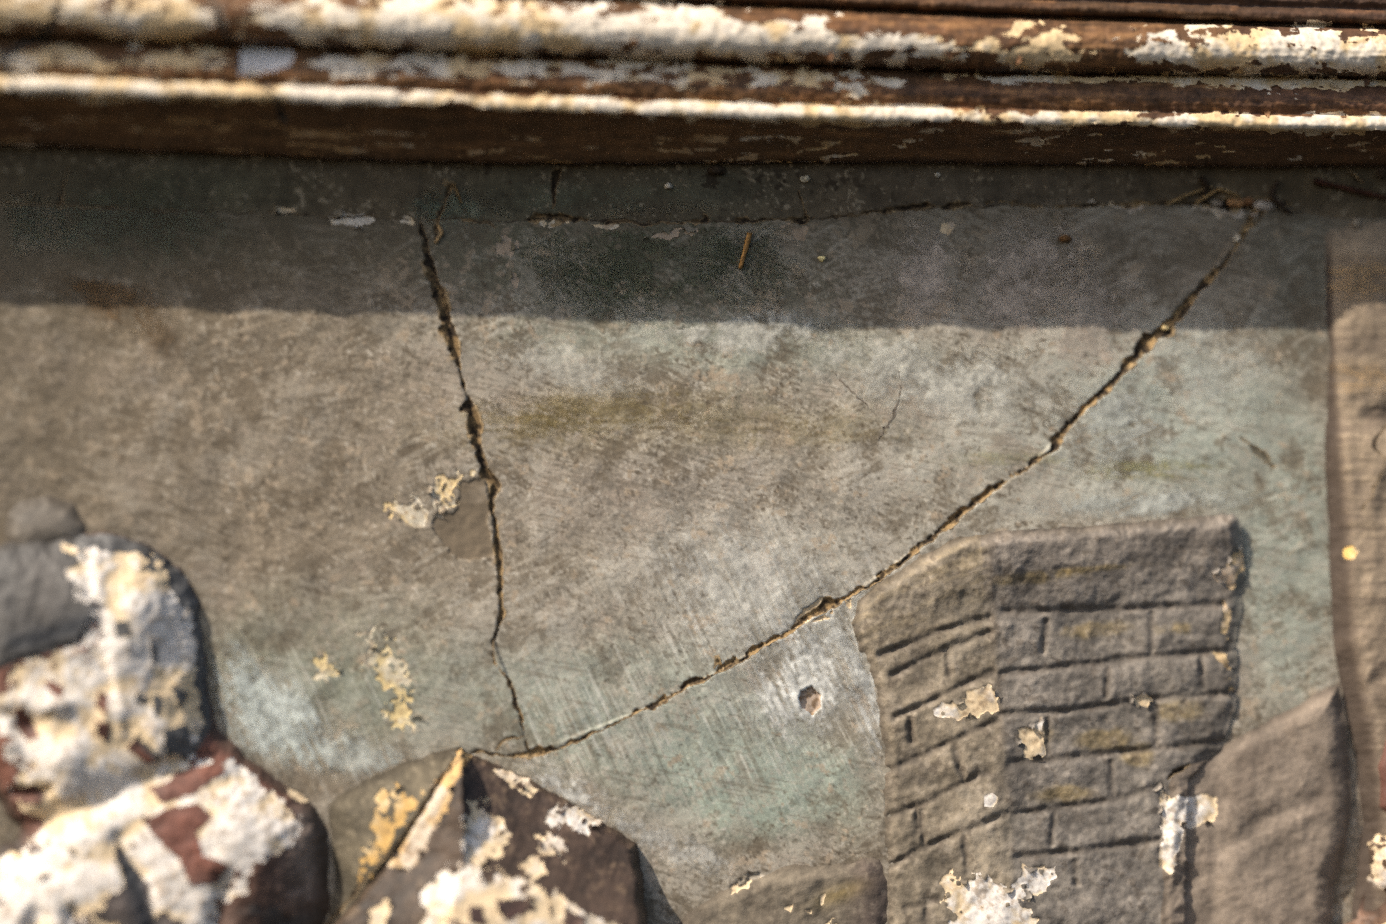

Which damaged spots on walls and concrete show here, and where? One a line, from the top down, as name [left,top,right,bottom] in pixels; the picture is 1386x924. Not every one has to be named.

peeling [0,0,1386,167]
spalling [383,469,501,560]
crack [1,168,1302,924]
peeling [312,651,343,682]
peeling [355,626,423,732]
peeling [0,543,309,924]
peeling [357,749,615,924]
spalling [730,877,761,895]
peeling [784,894,836,924]
peeling [939,863,1057,924]
peeling [1368,834,1386,889]